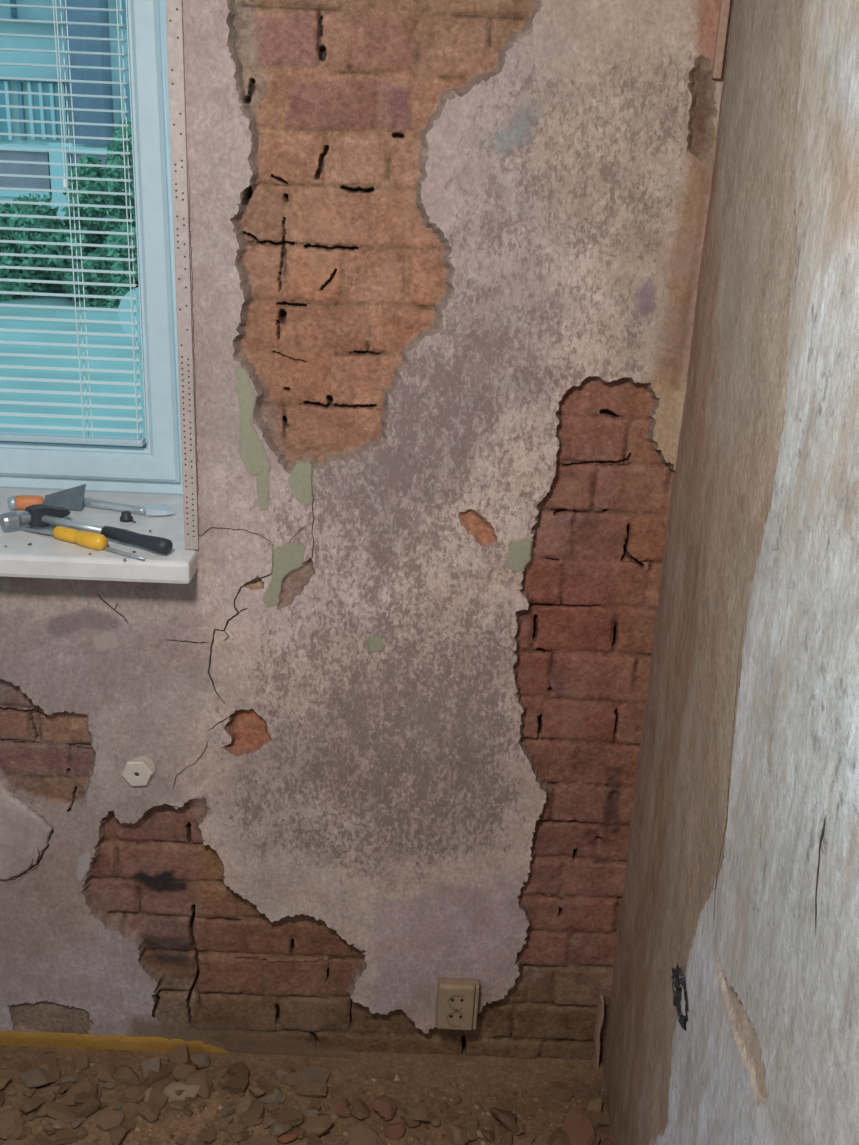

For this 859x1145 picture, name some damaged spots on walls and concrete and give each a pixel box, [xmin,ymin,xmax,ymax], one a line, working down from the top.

flaking render [226,0,543,510]
crack [141,176,315,819]
flaking render [244,576,264,590]
flaking render [277,557,315,610]
flaking render [458,509,498,548]
peeling [512,0,804,1145]
flaking render [0,679,96,880]
flaking render [222,708,273,756]
flaking render [7,1000,94,1035]
flaking render [81,797,614,1060]